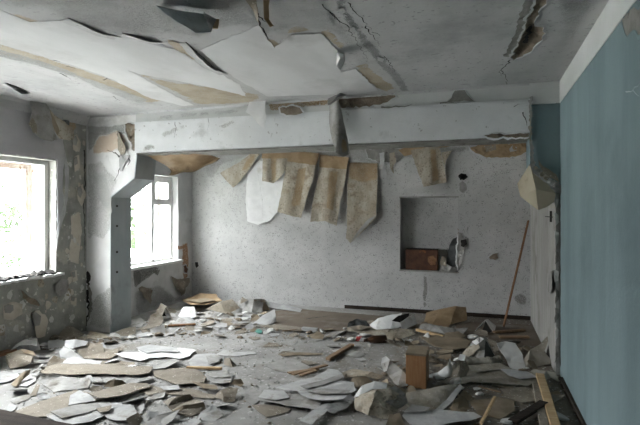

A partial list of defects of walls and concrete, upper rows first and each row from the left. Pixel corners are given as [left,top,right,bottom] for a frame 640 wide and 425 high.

flaking render [7,0,341,37]
crack [322,2,393,73]
flaking render [499,0,551,83]
spalling [269,100,328,117]
flaking render [93,121,135,174]
spalling [312,148,413,164]
spalling [439,96,561,194]
flaking render [0,106,85,338]
corrosion [177,242,189,278]
spalling [455,229,469,271]